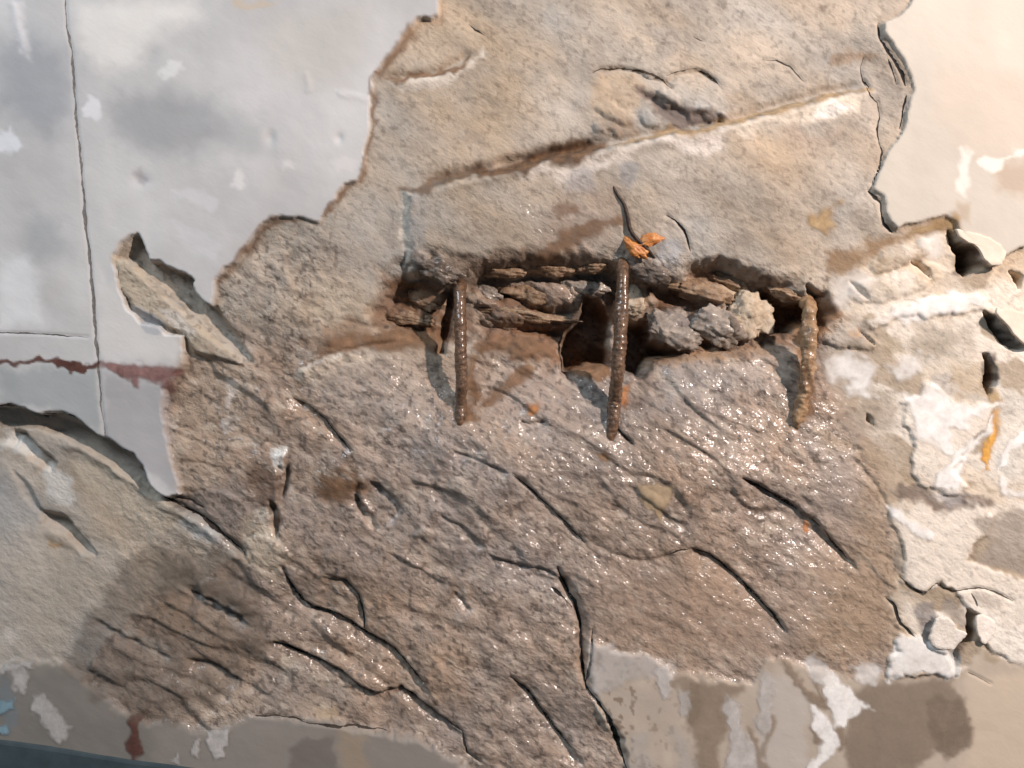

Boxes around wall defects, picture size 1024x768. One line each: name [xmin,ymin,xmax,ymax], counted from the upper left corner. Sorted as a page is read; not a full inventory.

crack [0,0,134,454]
corrosion [0,356,184,392]
spalling [0,406,243,676]
spalling [407,90,912,310]
corrosion [761,291,802,325]
corrosion [813,298,840,334]
damp [825,355,874,398]
crack [860,26,907,233]
peeling [806,216,1024,675]
damp [904,383,993,490]
crack [552,569,627,768]
damp [783,636,970,768]